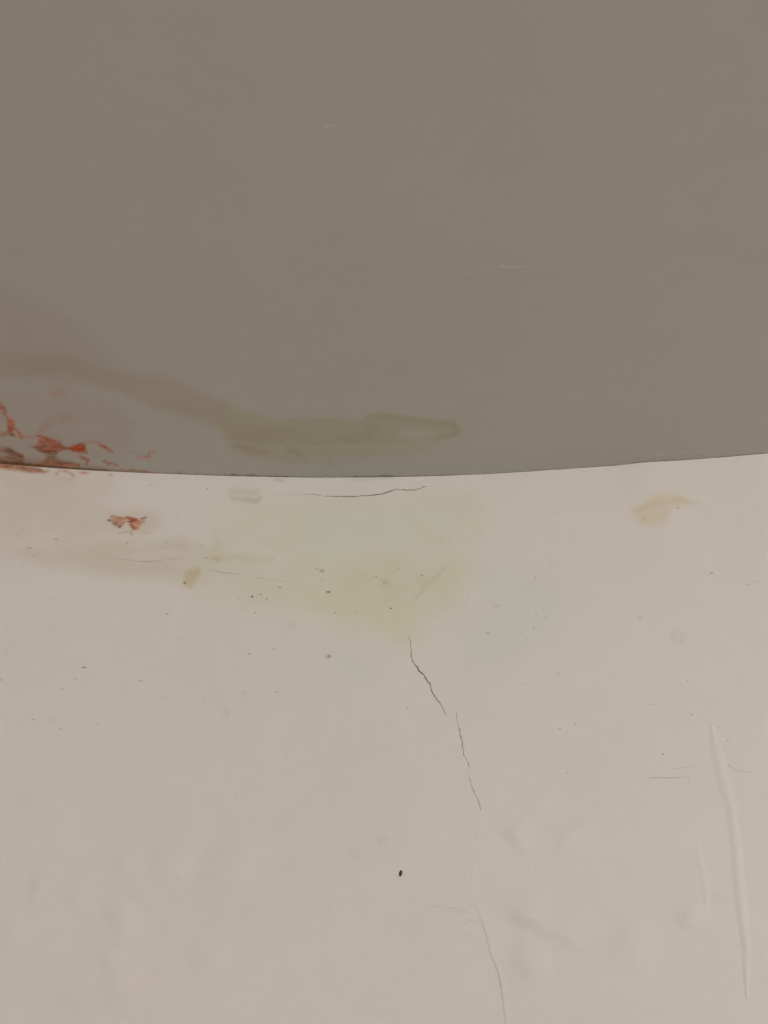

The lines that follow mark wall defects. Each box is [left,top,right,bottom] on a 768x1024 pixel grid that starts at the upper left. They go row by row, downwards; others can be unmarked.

rust [0,377,158,483]
rust [99,503,170,541]
leakage [0,342,505,662]
crack [48,453,766,499]
crack [405,633,483,815]